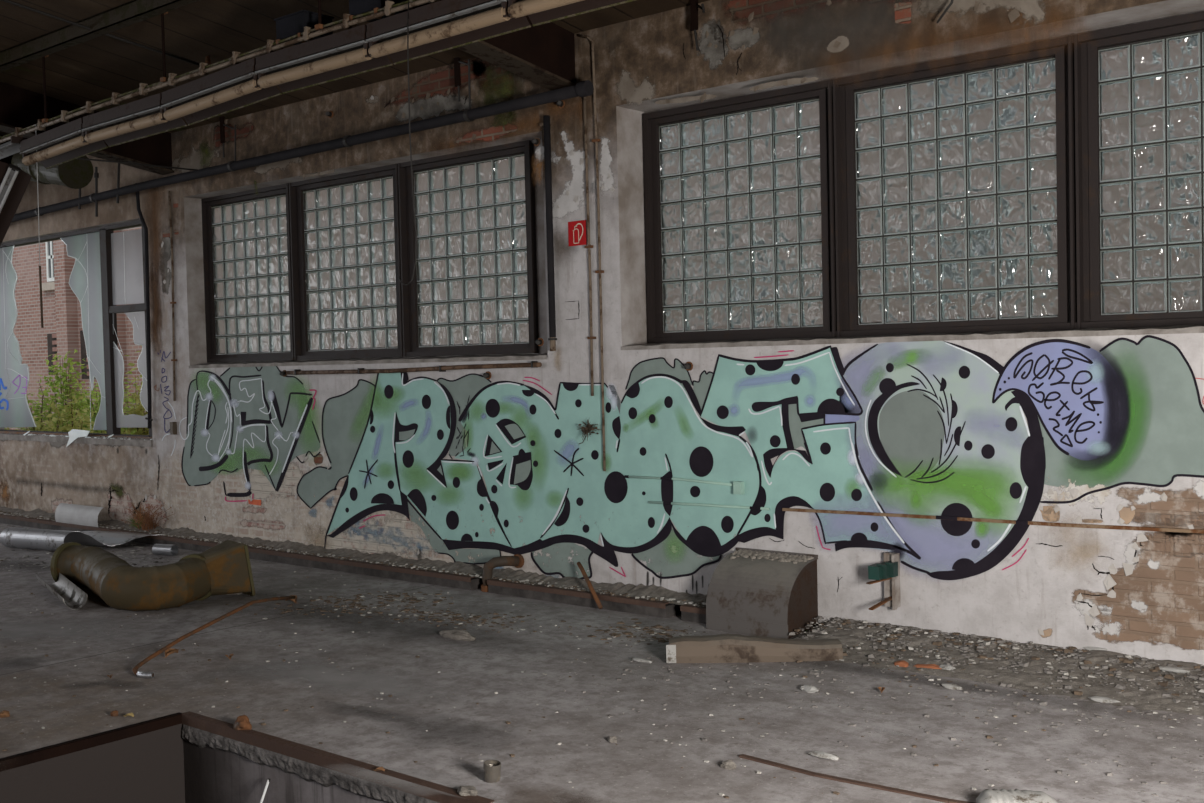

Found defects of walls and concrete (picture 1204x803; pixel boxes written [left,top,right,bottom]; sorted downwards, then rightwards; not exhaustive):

peeling [894,0,1045,25]
spalling [697,19,760,70]
spalling [827,36,849,53]
peeling [535,131,616,219]
flaking render [1039,477,1204,650]